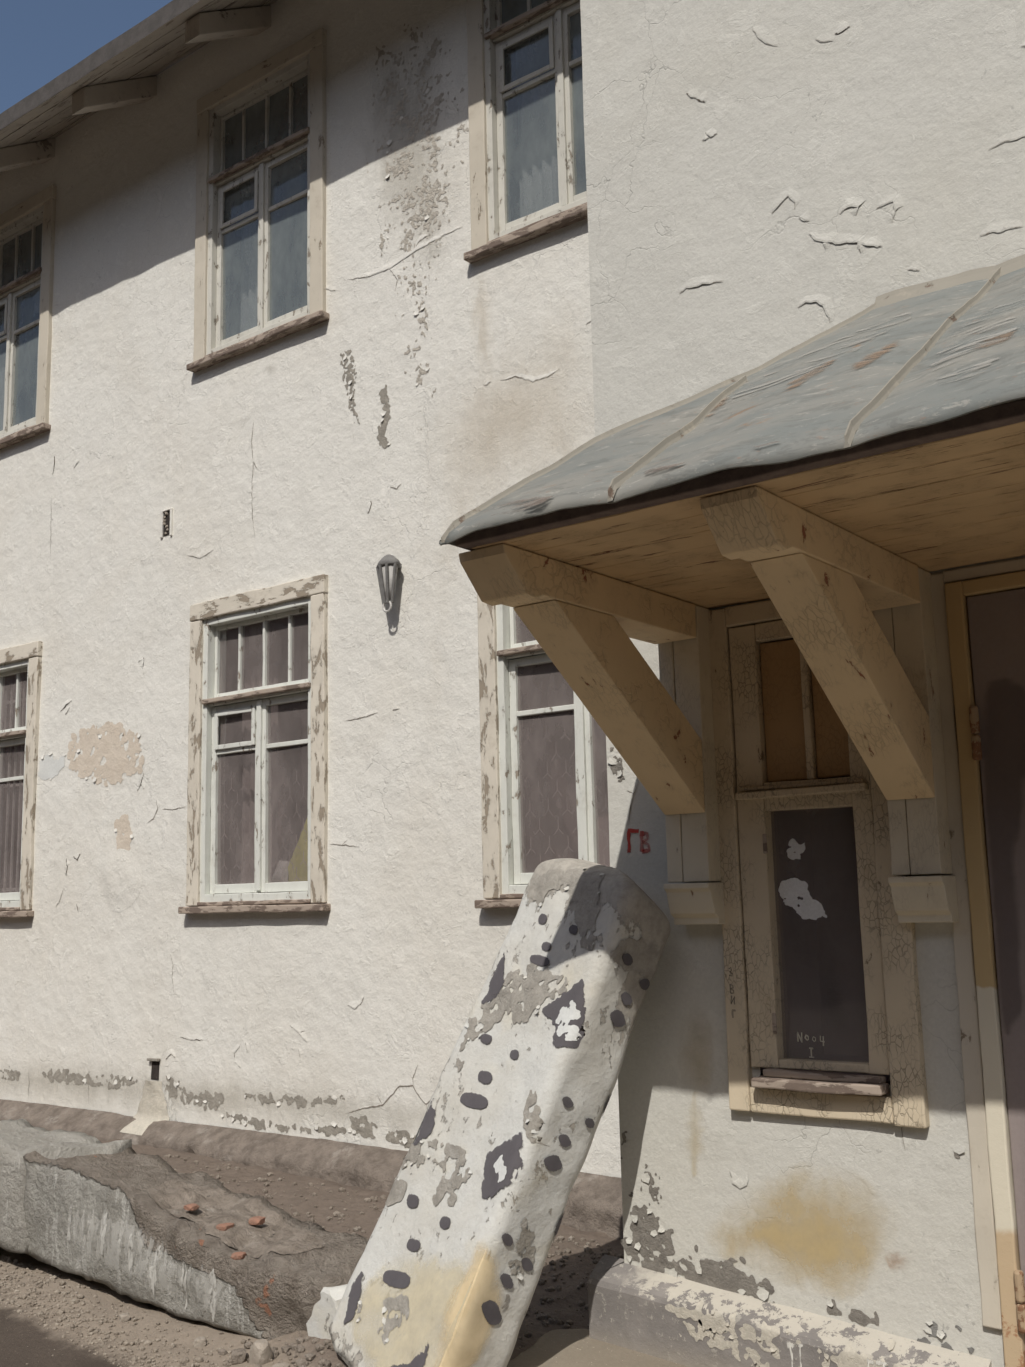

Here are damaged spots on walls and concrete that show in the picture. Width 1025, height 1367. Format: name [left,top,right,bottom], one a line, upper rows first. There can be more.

peeling [366,23,469,397]
crack [326,225,463,291]
peeling [340,350,360,424]
peeling [377,385,391,449]
peeling [38,721,144,787]
peeling [42,1068,137,1090]
crack [344,1064,434,1114]
peeling [165,1074,472,1206]
peeling [620,1164,801,1367]
peeling [826,1299,879,1326]
peeling [817,1339,922,1367]
peeling [917,1319,974,1354]